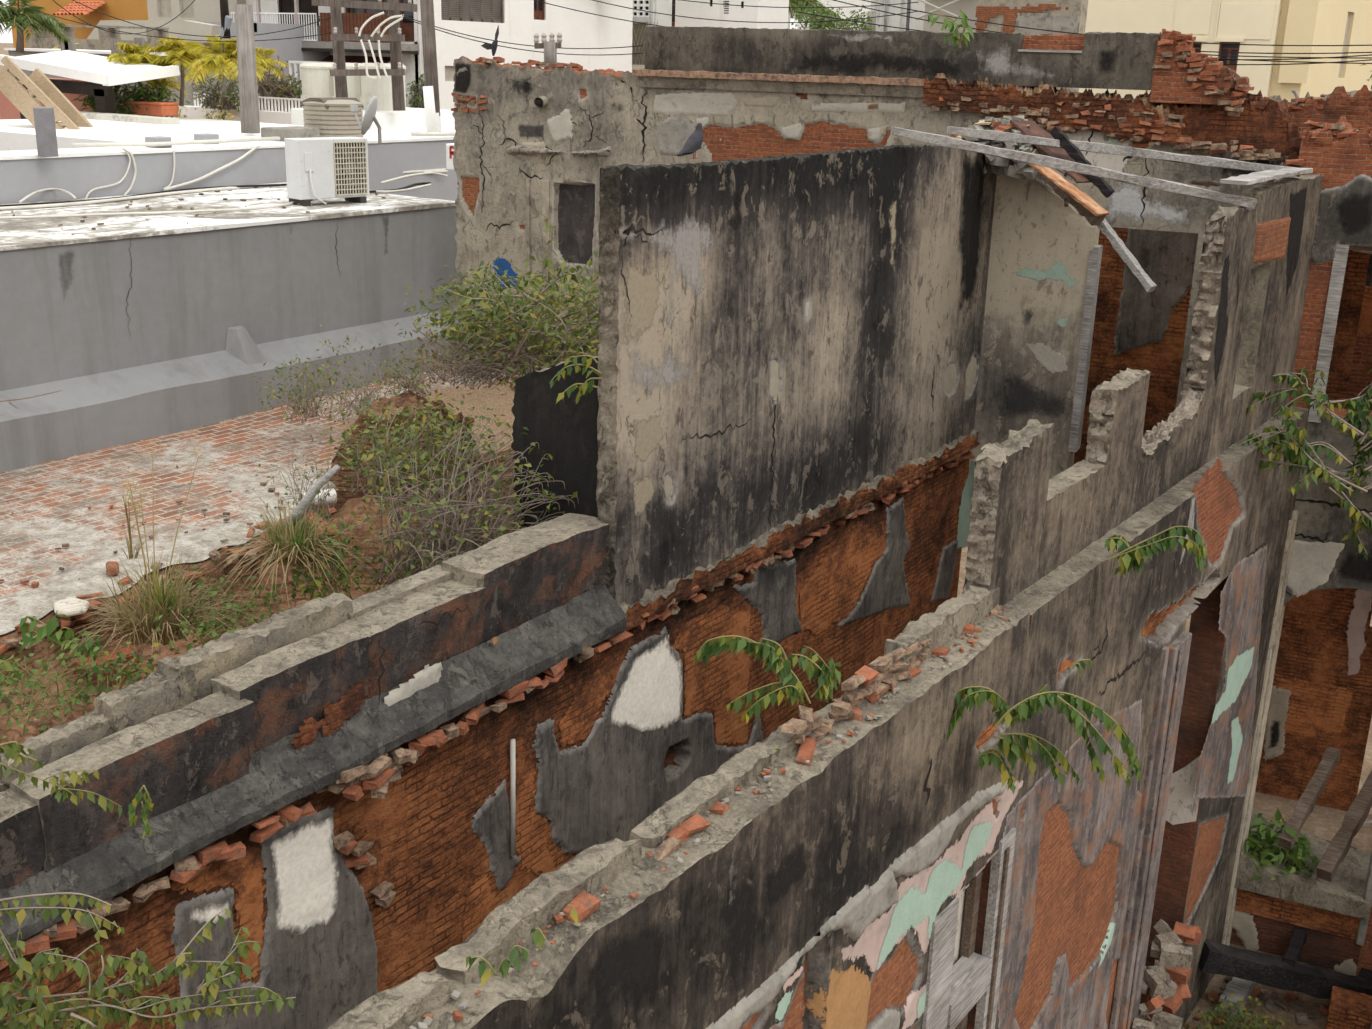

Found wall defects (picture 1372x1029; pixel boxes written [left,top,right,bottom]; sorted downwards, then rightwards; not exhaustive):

crack [621,80,647,162]
spalling [702,121,890,162]
spalling [457,177,480,215]
crack [474,108,606,286]
damp [651,221,713,326]
damp [959,157,987,309]
spalling [291,662,443,750]
spalling [316,746,419,802]
spalling [332,830,377,869]
peeling [841,780,1024,1029]
spalling [1014,805,1119,1029]
spalling [742,966,805,1029]